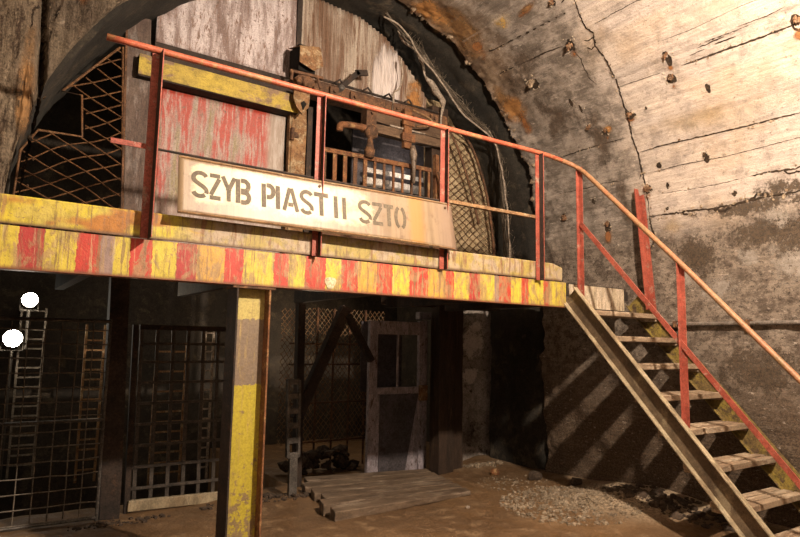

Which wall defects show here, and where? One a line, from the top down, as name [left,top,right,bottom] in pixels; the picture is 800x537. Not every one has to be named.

corrosion [413,0,483,58]
corrosion [496,87,532,133]
crack [486,0,800,251]